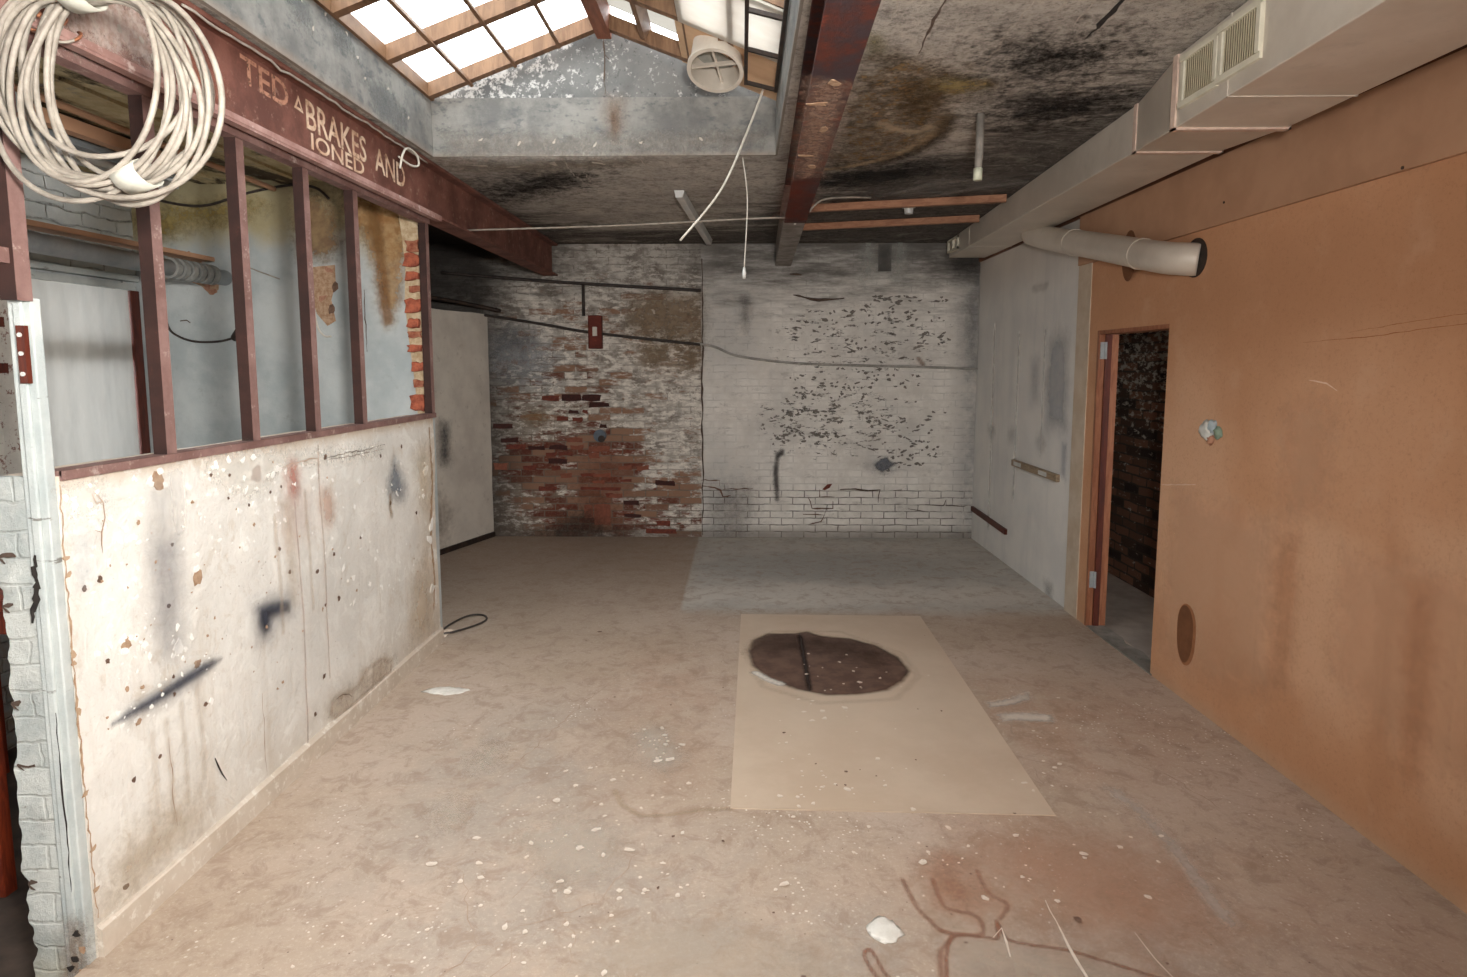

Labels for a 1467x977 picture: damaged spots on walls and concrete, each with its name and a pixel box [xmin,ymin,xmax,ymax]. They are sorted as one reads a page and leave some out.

crack [918,0,946,54]
crack [1085,0,1125,39]
leakage [820,25,1138,191]
peeling [761,295,951,472]
spalling [493,394,677,534]